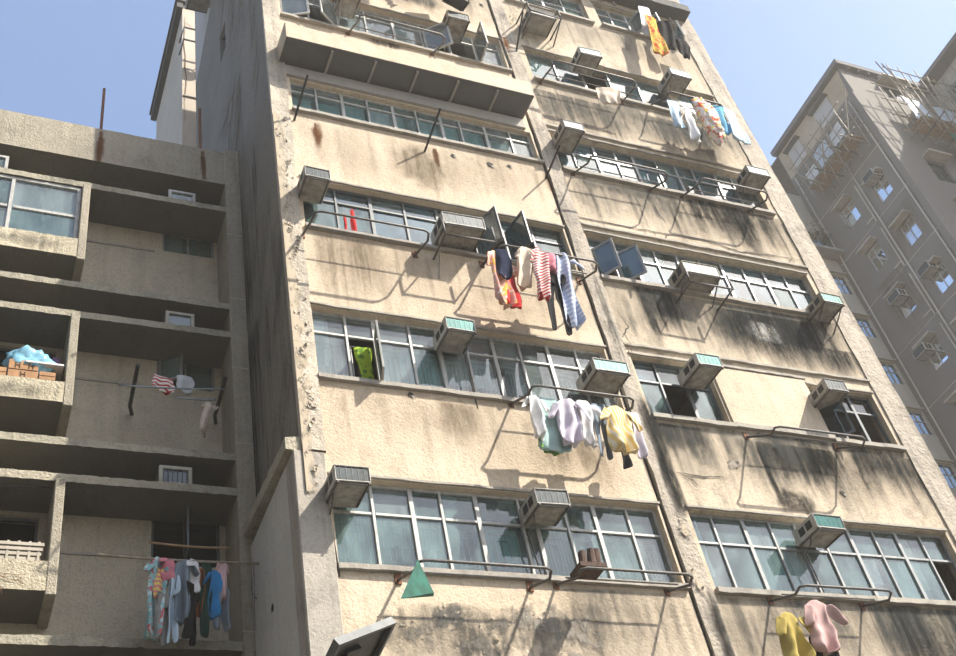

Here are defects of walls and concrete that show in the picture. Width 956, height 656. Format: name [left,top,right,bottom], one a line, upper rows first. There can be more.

water stain [541,91,606,125]
water stain [650,113,711,148]
water stain [612,186,785,247]
water stain [634,286,698,329]
water stain [712,302,856,369]
water stain [721,429,924,511]